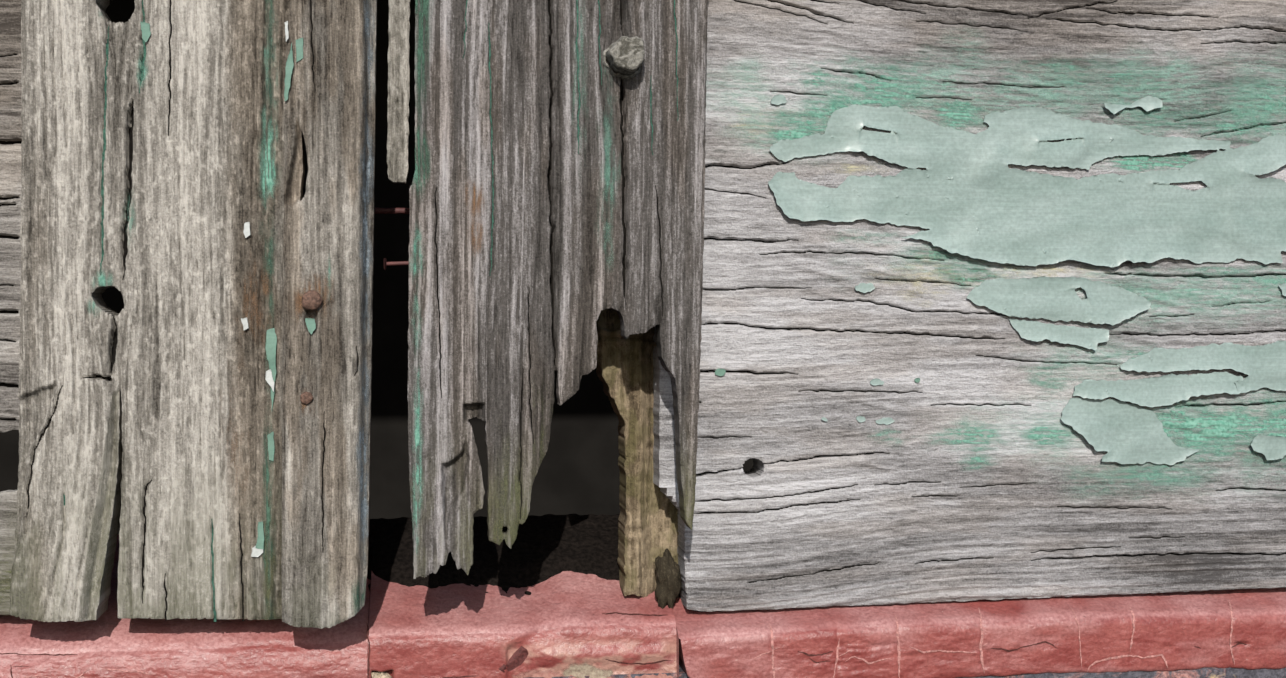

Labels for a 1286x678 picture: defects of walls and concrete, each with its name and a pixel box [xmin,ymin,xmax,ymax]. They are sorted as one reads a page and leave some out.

crack [734,0,1286,44]
crack [770,68,1065,100]
crack [100,0,172,280]
crack [1174,110,1286,137]
peeling [768,96,1286,351]
peeling [1061,340,1286,465]
crack [754,605,1168,678]
crack [1194,599,1246,665]